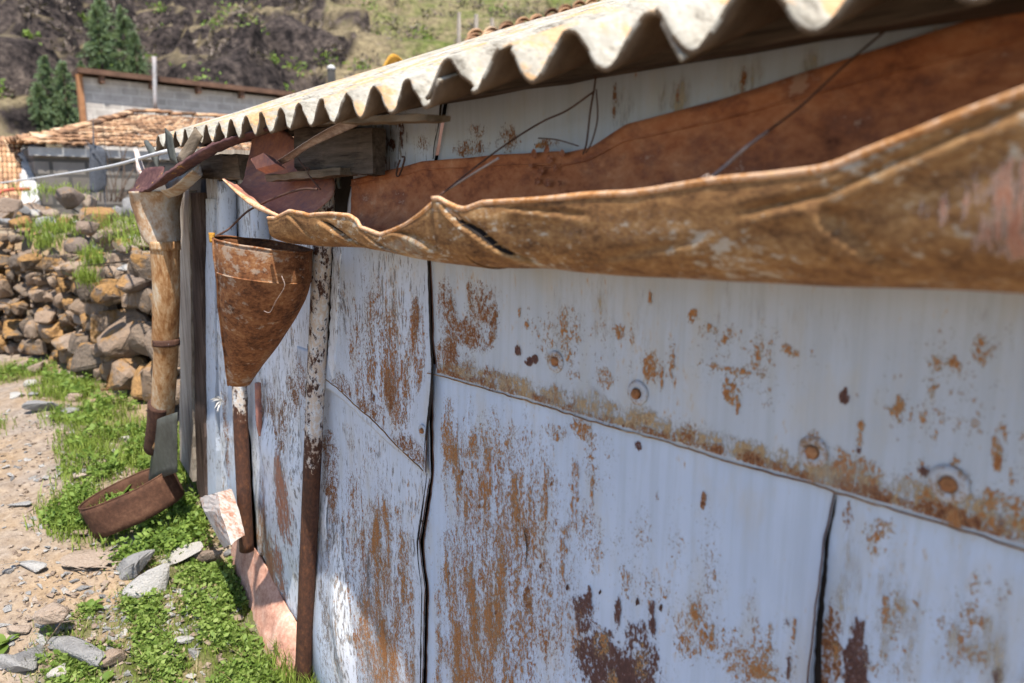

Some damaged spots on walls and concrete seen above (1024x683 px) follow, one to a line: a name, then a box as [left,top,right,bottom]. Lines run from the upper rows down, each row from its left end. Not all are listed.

crack [416,261,434,683]
rust [322,260,1024,683]
crack [814,496,836,683]